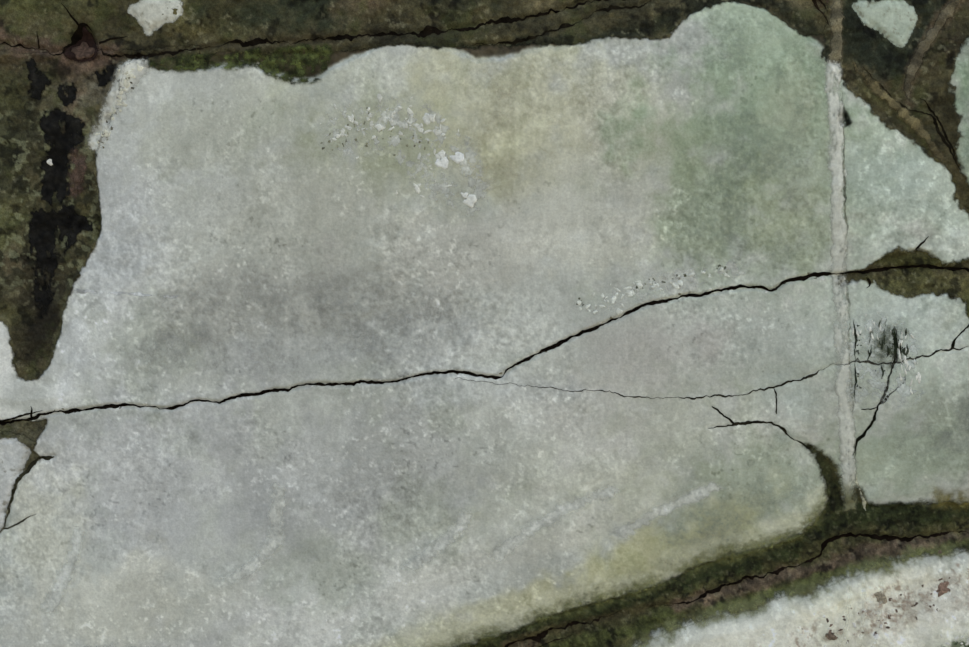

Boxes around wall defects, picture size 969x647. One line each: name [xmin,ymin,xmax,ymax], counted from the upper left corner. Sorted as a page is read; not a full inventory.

crack [0,0,651,60]
crack [0,236,969,455]